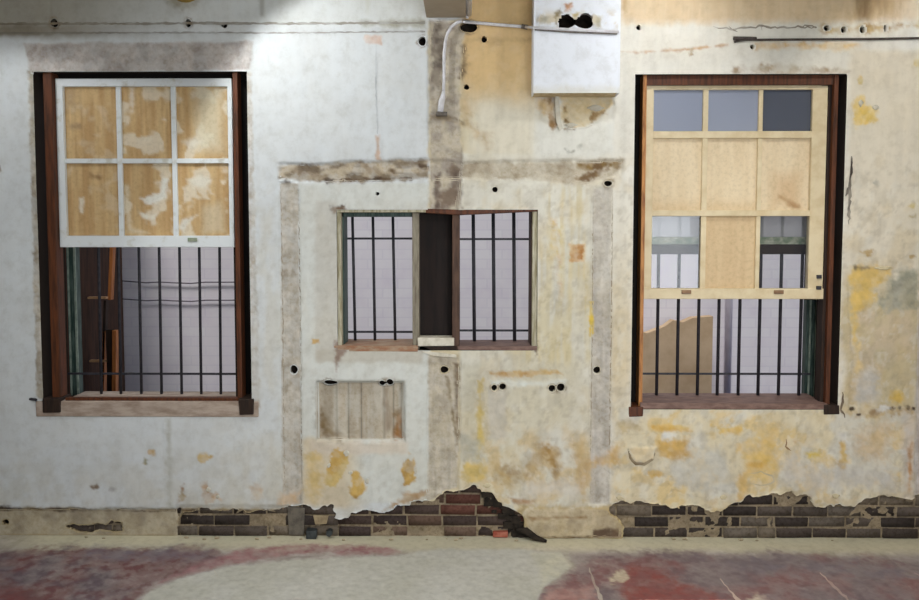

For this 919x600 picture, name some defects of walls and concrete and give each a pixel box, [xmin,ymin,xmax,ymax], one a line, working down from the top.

damp [851,0,874,25]
spalling [817,17,919,41]
flaking render [414,17,482,115]
peeling [530,94,615,135]
peeling [729,59,882,131]
flaking render [22,15,262,409]
crack [845,156,853,224]
peeling [0,120,919,600]